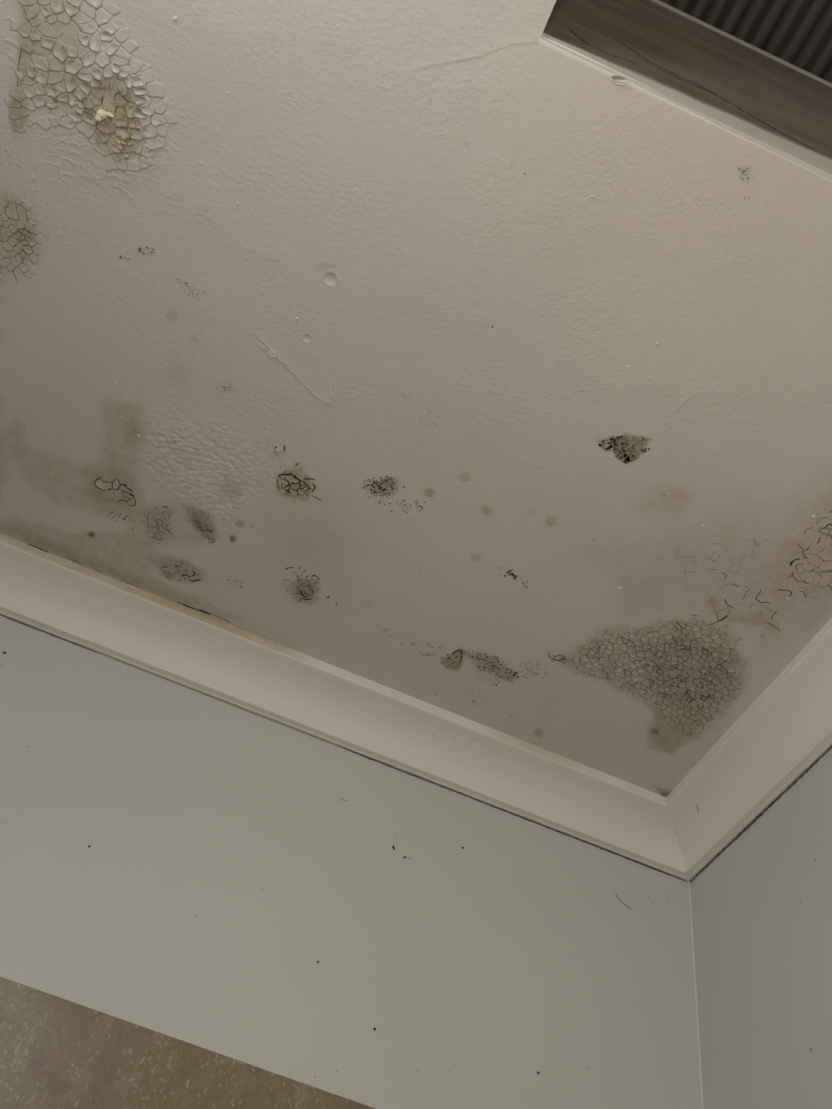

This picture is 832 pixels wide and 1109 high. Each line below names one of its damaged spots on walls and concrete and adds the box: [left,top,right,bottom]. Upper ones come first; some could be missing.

peeling [0,0,220,231]
crack [94,477,215,582]
water stain [0,376,438,637]
water stain [383,447,832,761]
water stain [593,431,653,466]
crack [548,511,832,735]